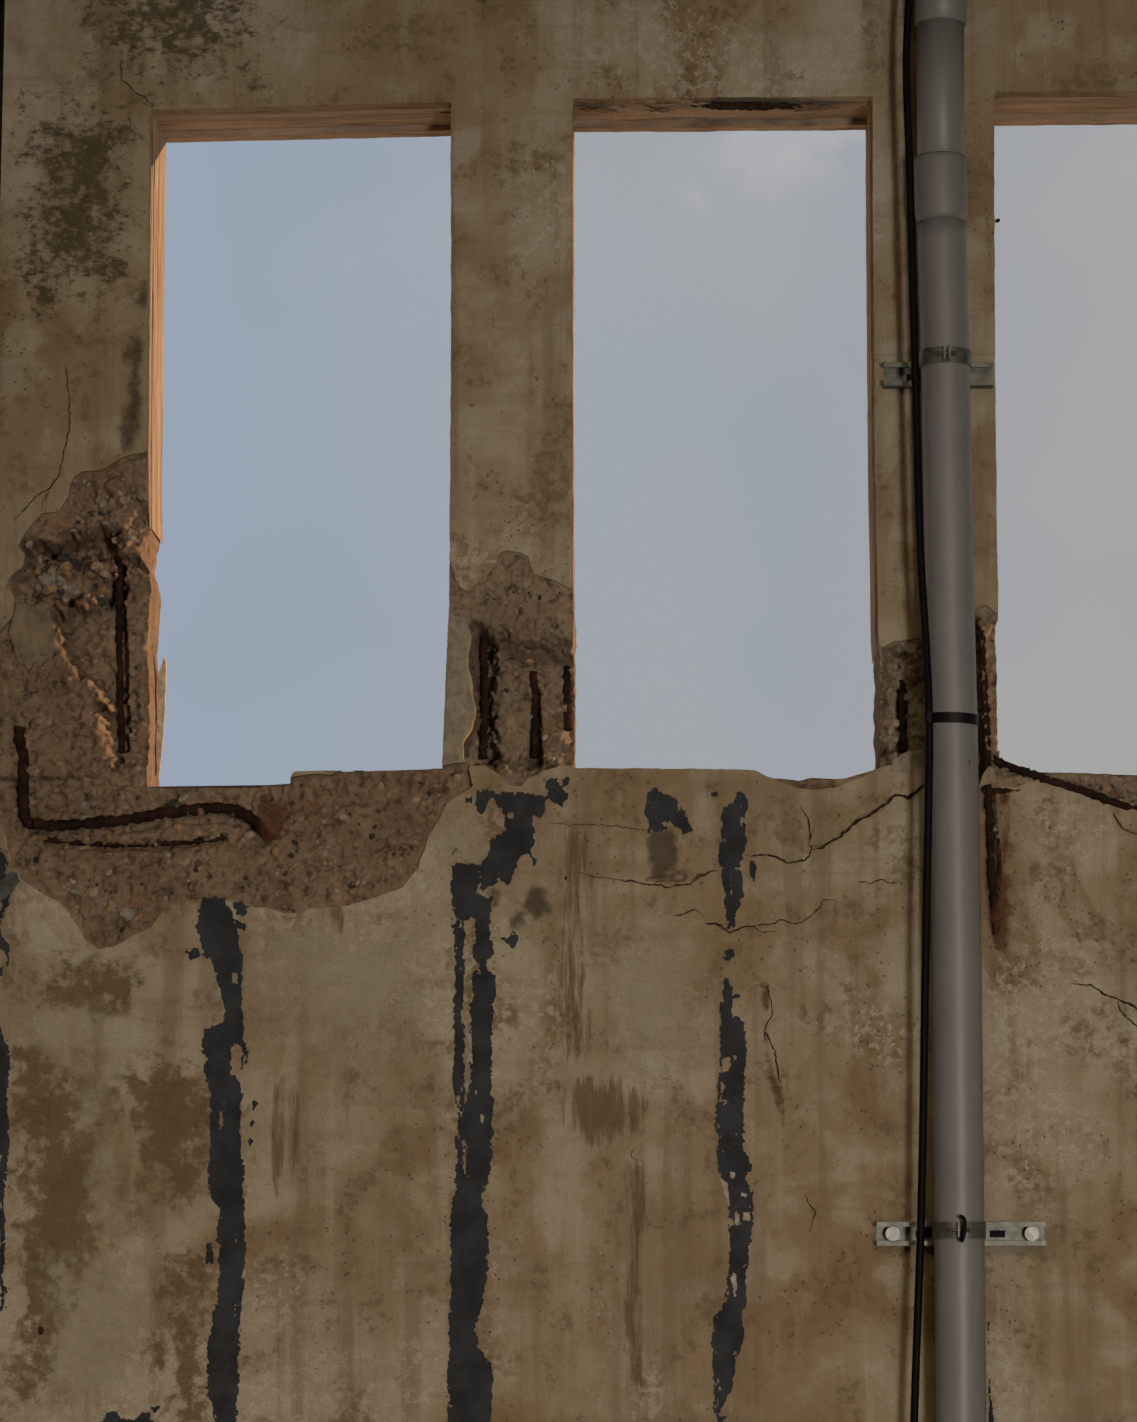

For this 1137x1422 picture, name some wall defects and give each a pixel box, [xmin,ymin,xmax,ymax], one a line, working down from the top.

damp [0,848,17,976]
damp [0,1027,101,1400]
damp [113,896,258,1422]
spalling [0,450,577,949]
damp [447,777,570,1422]
crack [552,822,641,830]
damp [710,978,754,1422]
damp [711,791,757,930]
crack [574,786,925,934]
spalling [772,637,925,846]
spalling [975,606,1137,942]
crack [1073,983,1137,1027]